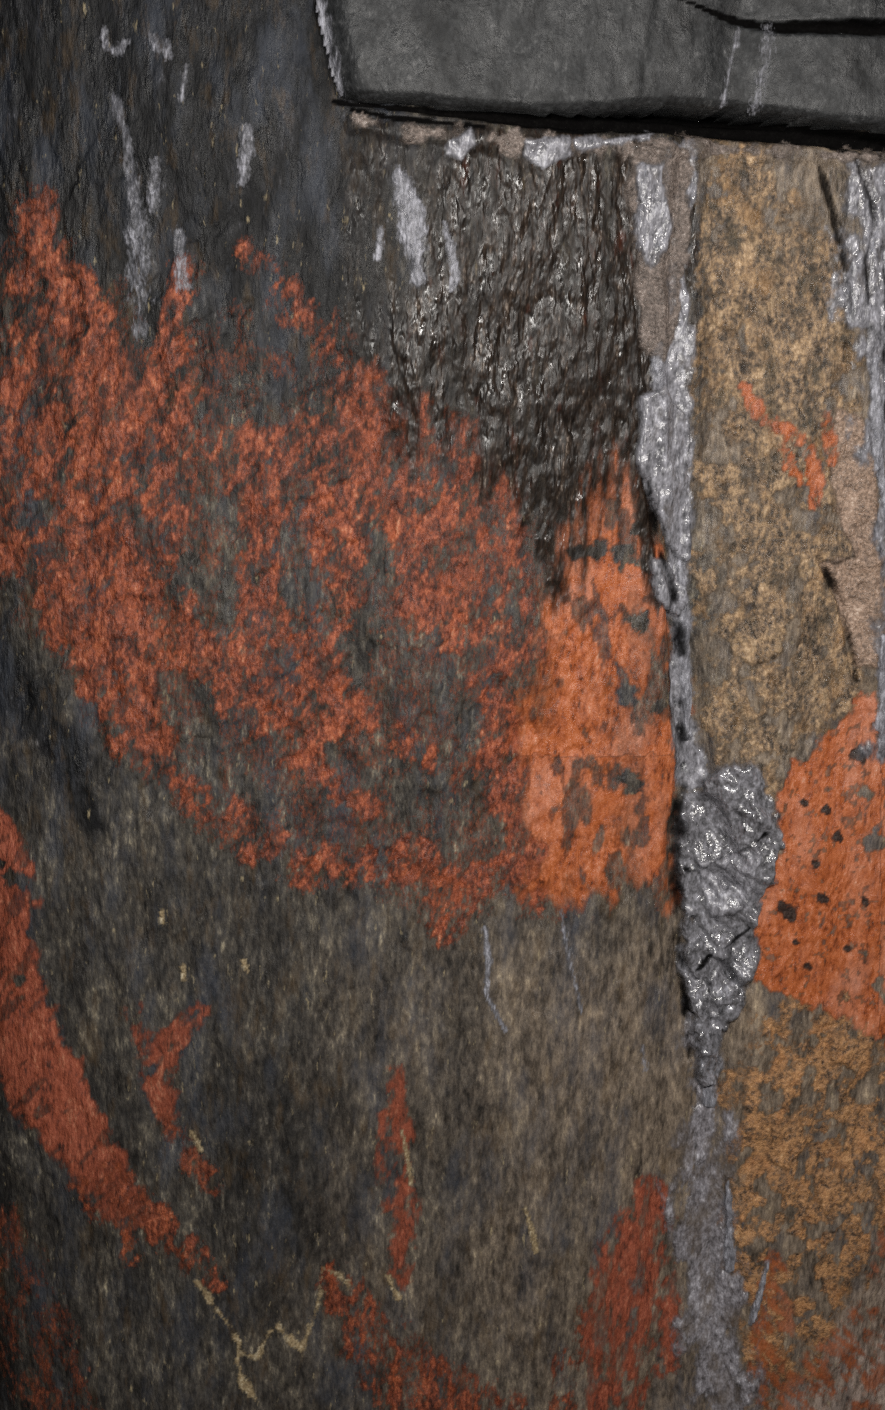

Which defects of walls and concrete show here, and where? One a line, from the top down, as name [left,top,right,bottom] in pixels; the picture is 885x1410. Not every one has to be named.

crack [686,1,885,36]
corrosion [0,185,683,949]
damp [353,123,707,791]
corrosion [738,381,838,510]
damp [828,159,885,764]
corrosion [0,810,226,1293]
corrosion [376,1067,420,1290]
corrosion [319,1262,527,1410]
damp [483,926,508,1032]
corrosion [549,1175,682,1410]
efflorescence [658,1010,769,1410]
corrosion [753,692,885,1040]